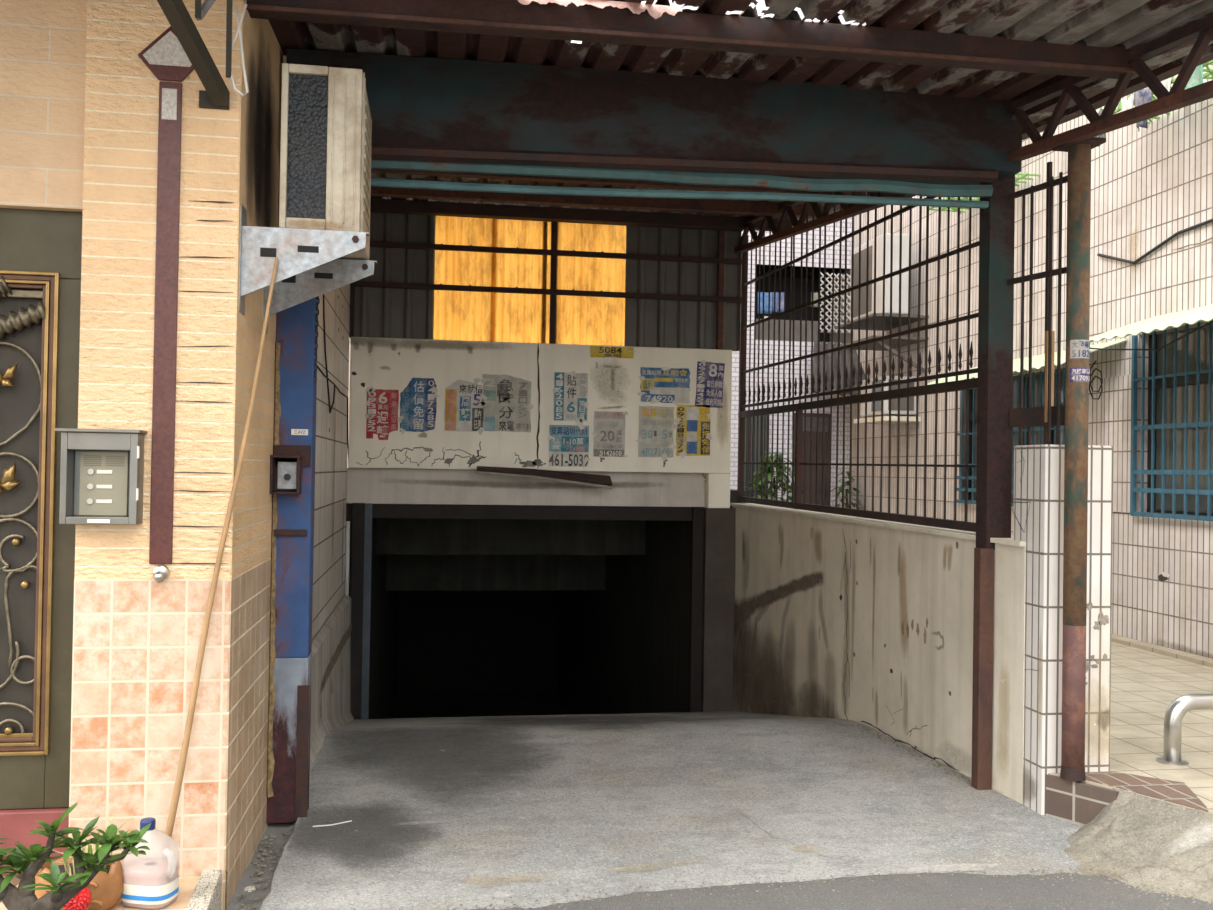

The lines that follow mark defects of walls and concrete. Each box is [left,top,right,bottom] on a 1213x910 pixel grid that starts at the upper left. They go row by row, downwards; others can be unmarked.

crack [196,201,234,222]
crack [188,253,234,261]
crack [181,382,234,403]
crack [515,344,540,467]
crack [357,441,486,467]
crack [174,472,232,492]
water stain [734,572,823,631]